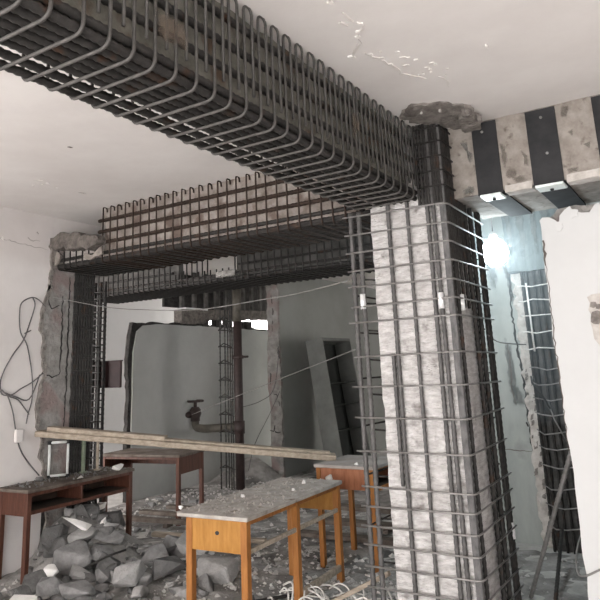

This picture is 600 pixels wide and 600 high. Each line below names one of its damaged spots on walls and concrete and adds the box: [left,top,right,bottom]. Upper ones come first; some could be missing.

spalling [399,101,482,133]
flaking render [34,232,106,479]
spalling [266,283,285,447]
flaking render [542,240,570,454]
flaking render [587,294,600,345]
spalling [271,456,286,478]